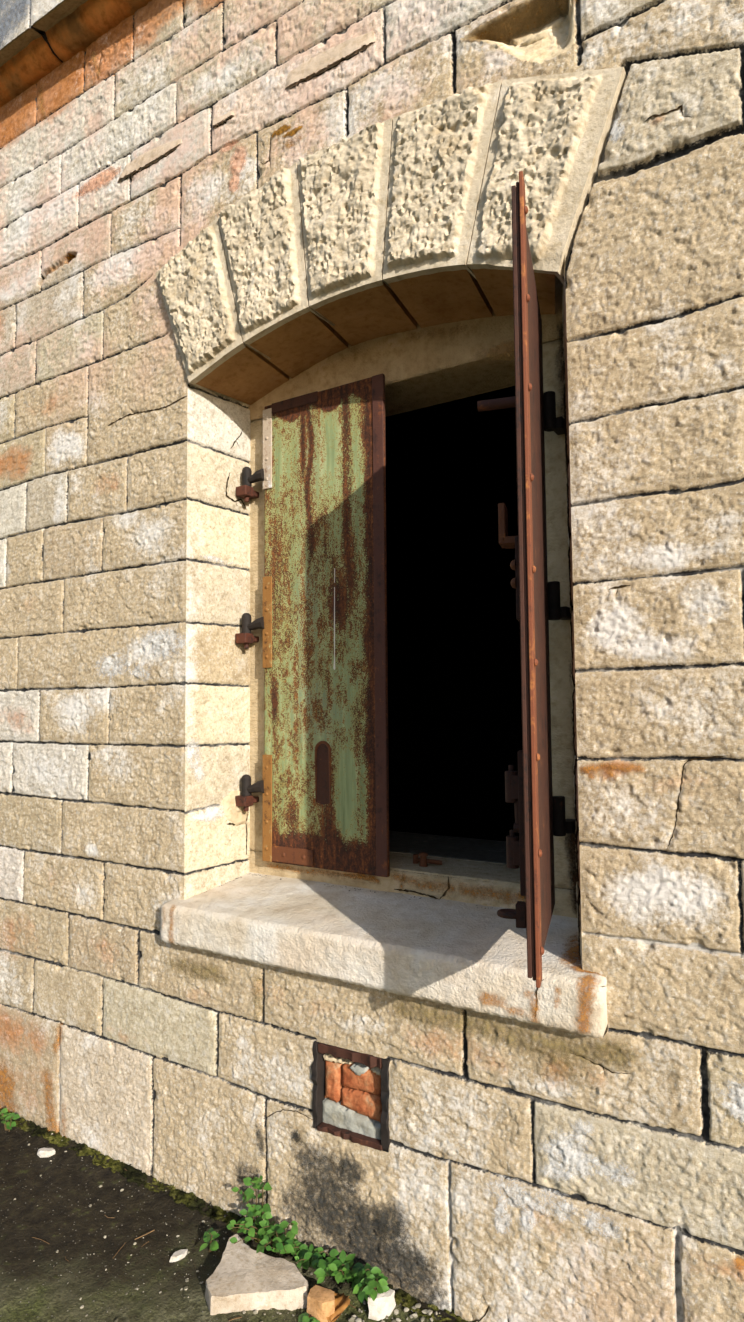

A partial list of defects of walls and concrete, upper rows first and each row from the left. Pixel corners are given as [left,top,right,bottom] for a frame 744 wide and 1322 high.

peeling [285,31,376,89]
spalling [460,0,578,64]
rust [580,764,643,779]
crack [667,756,723,848]
rust [563,935,599,1033]
rust [44,1072,65,1133]
damp [237,1124,447,1307]